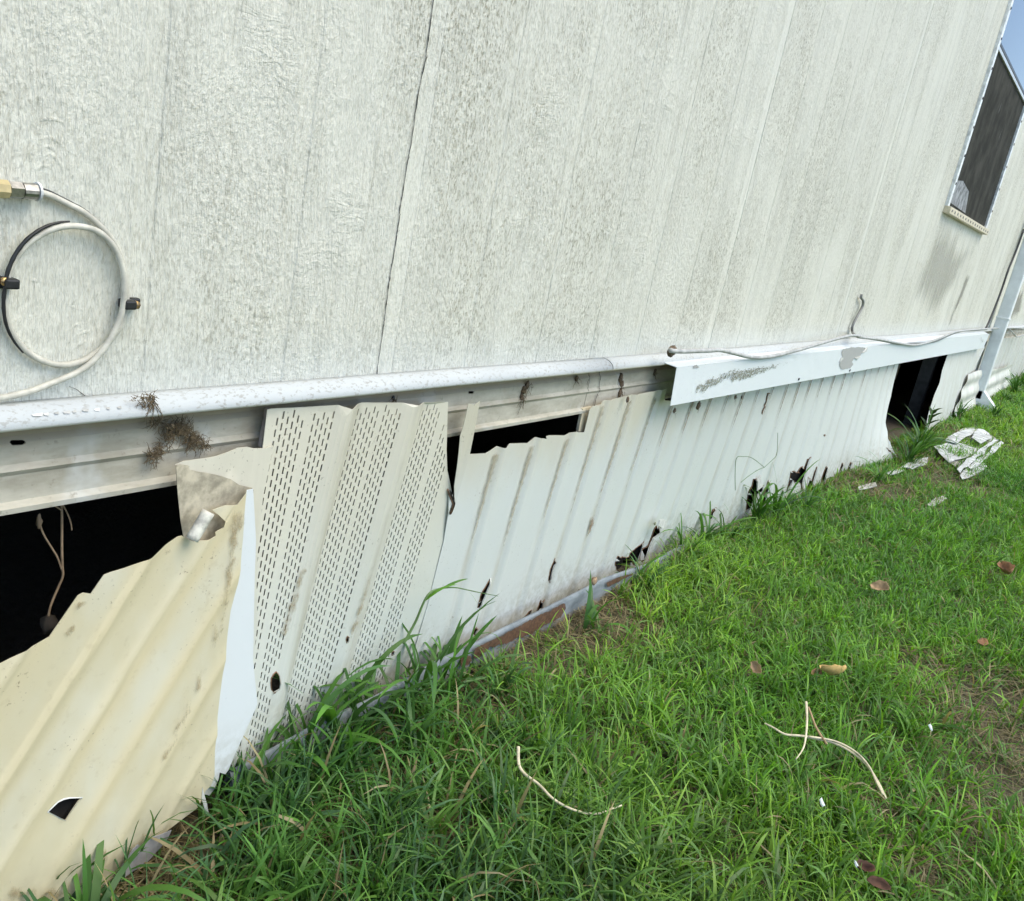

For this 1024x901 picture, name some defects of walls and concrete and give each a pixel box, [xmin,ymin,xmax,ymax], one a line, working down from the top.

peeling [839,347,868,370]